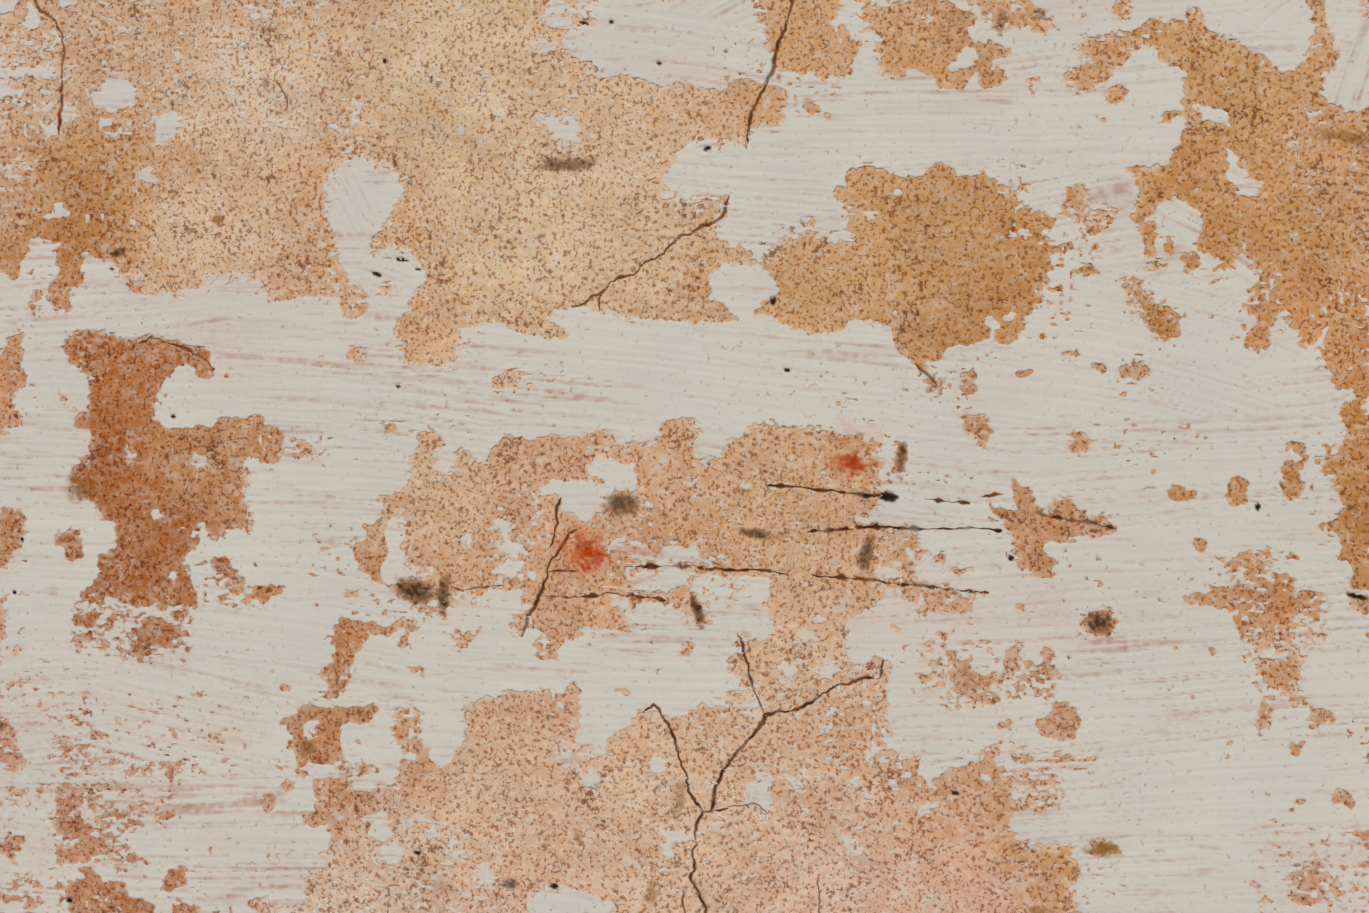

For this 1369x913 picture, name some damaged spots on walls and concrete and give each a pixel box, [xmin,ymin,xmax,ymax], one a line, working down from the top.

crack [34,0,65,135]
crack [745,0,793,149]
crack [571,196,729,310]
peeling [0,0,1369,653]
crack [521,498,578,637]
peeling [0,317,1122,913]
peeling [1135,538,1369,764]
crack [642,633,884,913]
peeling [1332,788,1356,810]